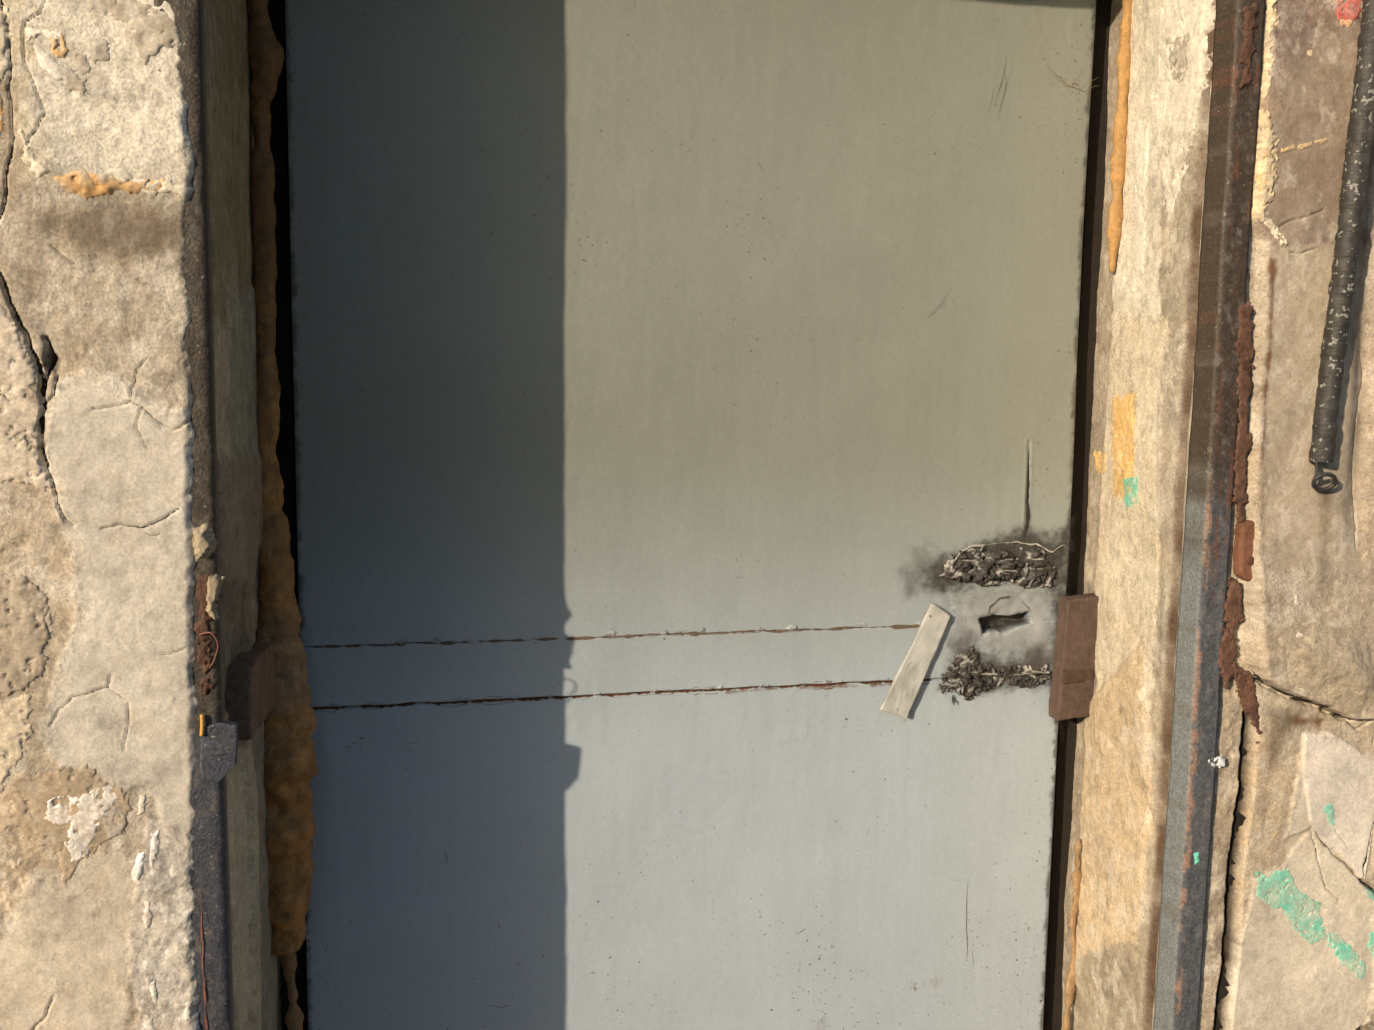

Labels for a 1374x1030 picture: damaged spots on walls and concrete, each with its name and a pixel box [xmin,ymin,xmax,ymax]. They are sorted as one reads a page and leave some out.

crack [0,0,46,219]
crack [0,273,69,522]
crack [101,361,187,449]
corrosion [1232,259,1276,523]
crack [106,509,179,535]
crack [50,677,129,744]
corrosion [1218,576,1263,744]
crack [1248,667,1364,729]
crack [1213,711,1247,1030]
crack [1310,822,1374,899]